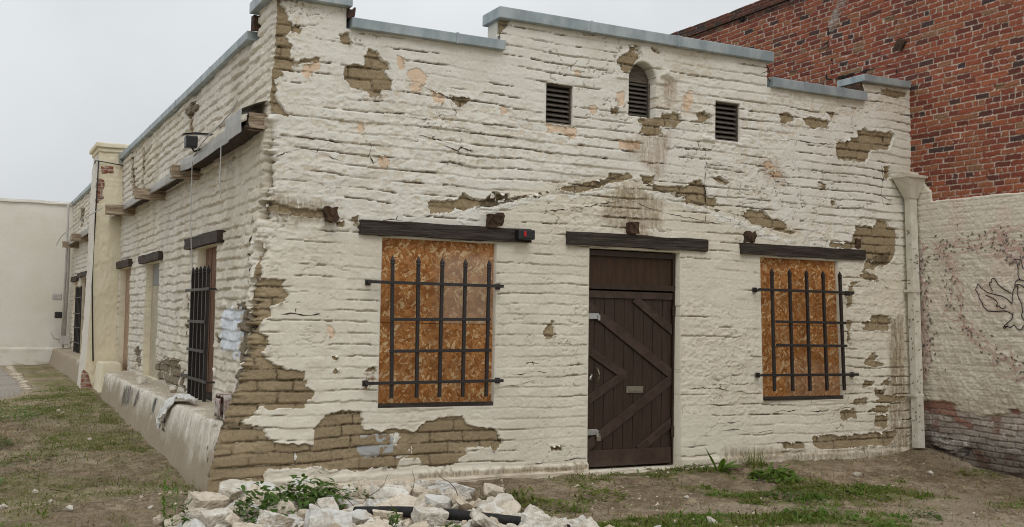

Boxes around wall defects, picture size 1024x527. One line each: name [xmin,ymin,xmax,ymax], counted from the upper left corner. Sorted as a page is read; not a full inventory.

peeling [262,0,321,117]
peeling [343,49,470,108]
peeling [617,45,640,74]
peeling [618,91,710,151]
peeling [778,111,835,129]
peeling [836,129,895,163]
peeling [428,173,728,214]
peeling [740,208,794,234]
peeling [829,220,896,346]
peeling [155,299,190,392]
peeling [207,241,502,493]
peeling [782,353,907,450]